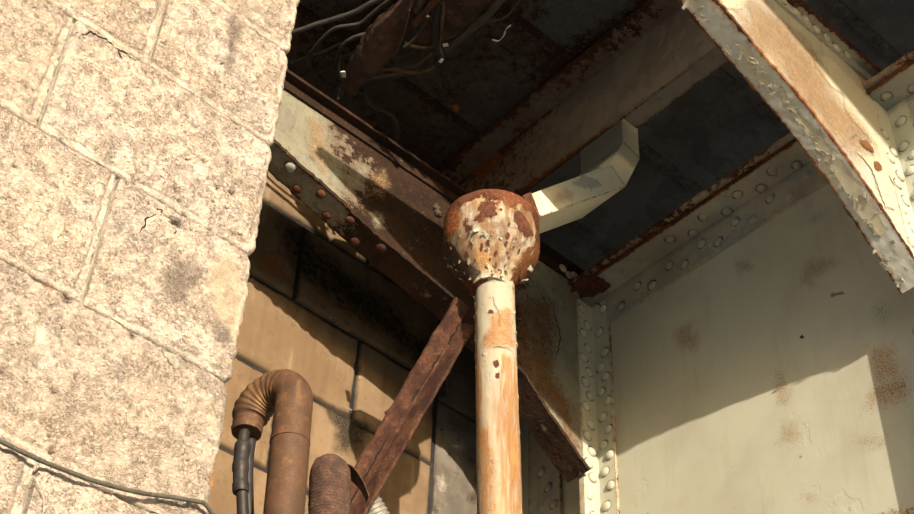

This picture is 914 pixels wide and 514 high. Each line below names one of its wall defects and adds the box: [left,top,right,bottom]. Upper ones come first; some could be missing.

crack [72,31,135,60]
peeling [681,0,711,23]
peeling [722,44,909,288]
rust [442,201,540,285]
rust [475,291,580,514]